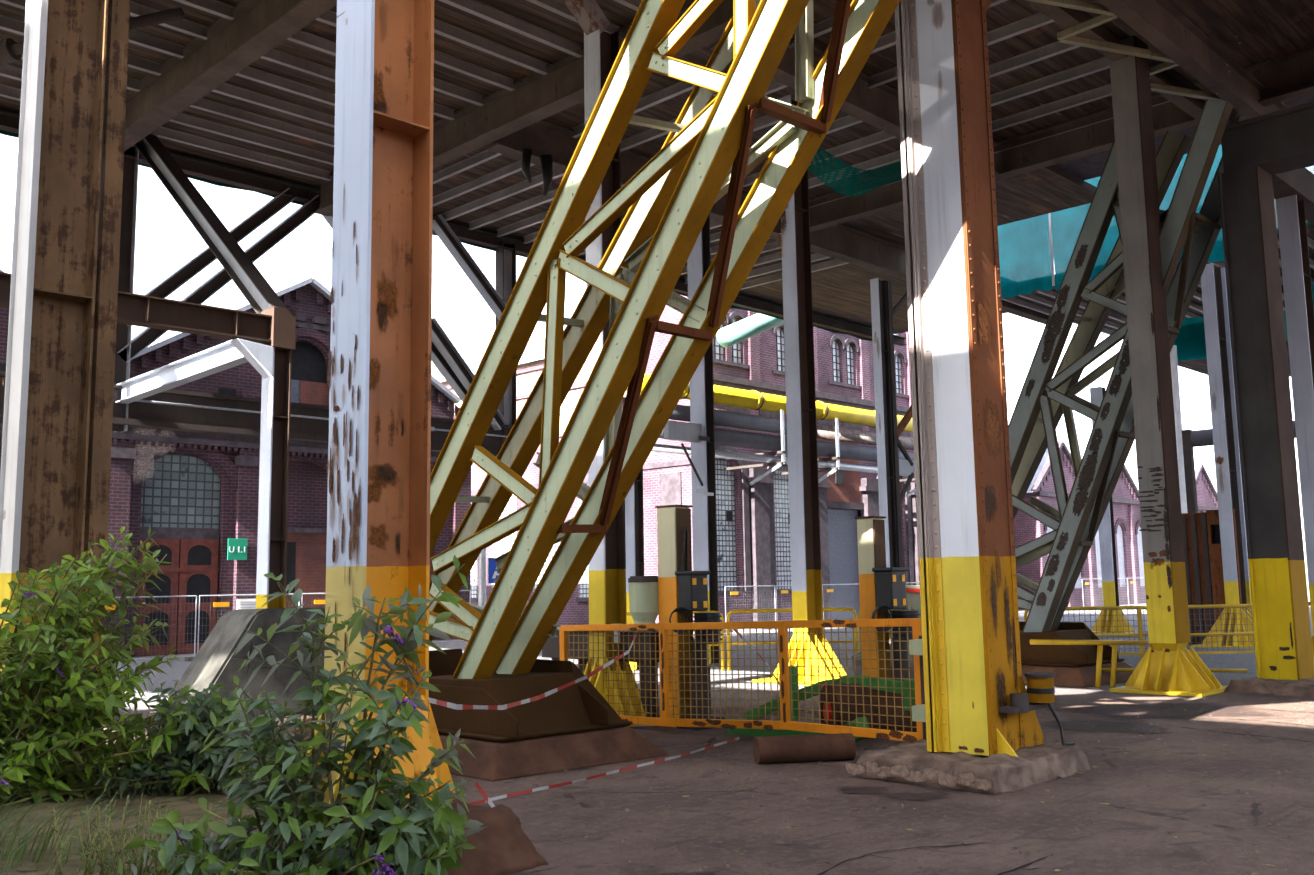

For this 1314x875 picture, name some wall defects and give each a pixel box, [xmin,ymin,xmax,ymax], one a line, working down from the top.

rust [369,359,380,390]
rust [367,464,396,503]
rust [371,525,400,554]